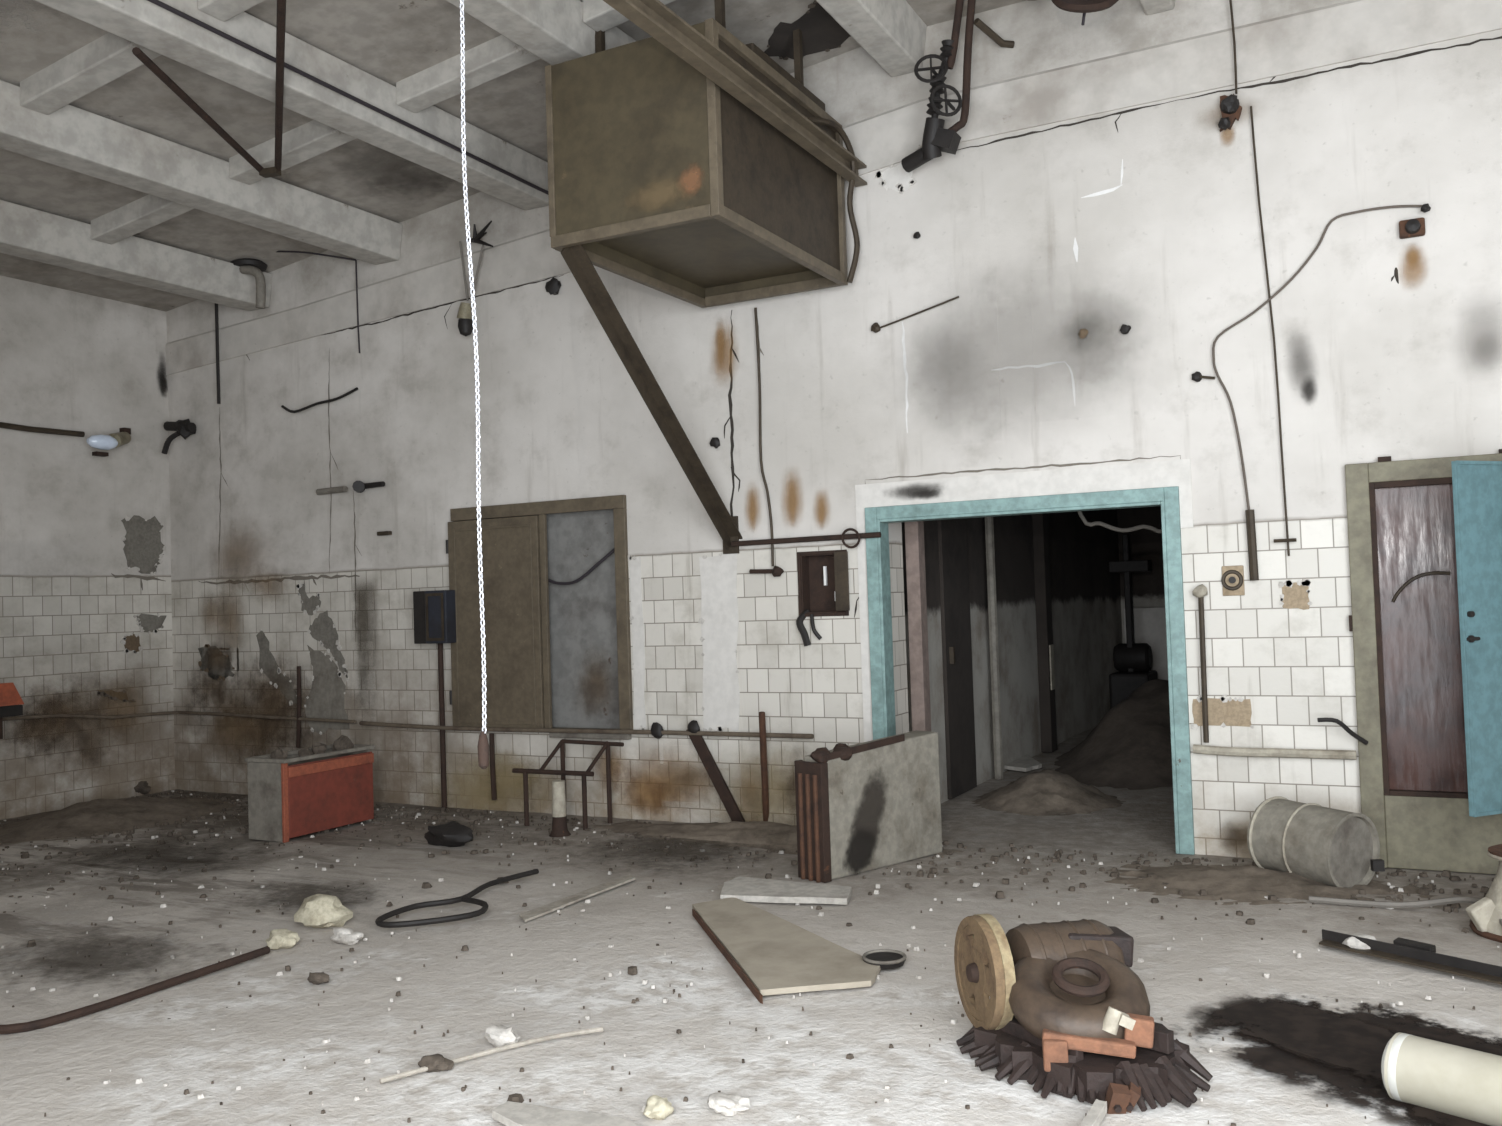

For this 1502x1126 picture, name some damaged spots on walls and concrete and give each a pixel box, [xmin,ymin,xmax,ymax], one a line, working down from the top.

rust [1406,251,1420,278]
rust [717,331,731,370]
rust [749,497,757,520]
rust [787,485,798,513]
rust [817,500,826,520]
peeling [121,515,167,576]
flaking render [256,580,350,735]
leakage [17,698,117,755]
leakage [202,649,309,749]
leakage [845,779,885,873]